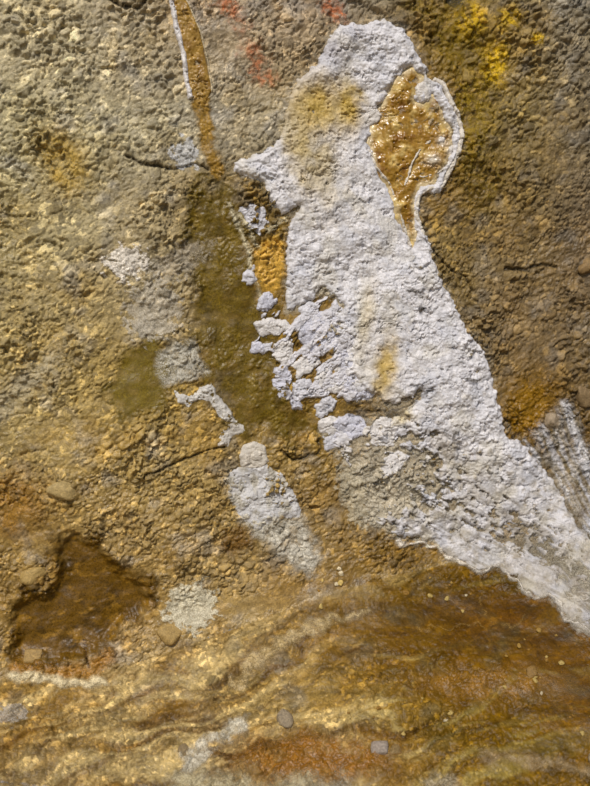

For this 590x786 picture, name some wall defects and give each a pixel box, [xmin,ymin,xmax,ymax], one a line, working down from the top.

crack [126,156,208,170]
water stain [100,3,590,638]
water stain [229,610,363,692]
water stain [172,718,252,786]
water stain [282,771,348,786]